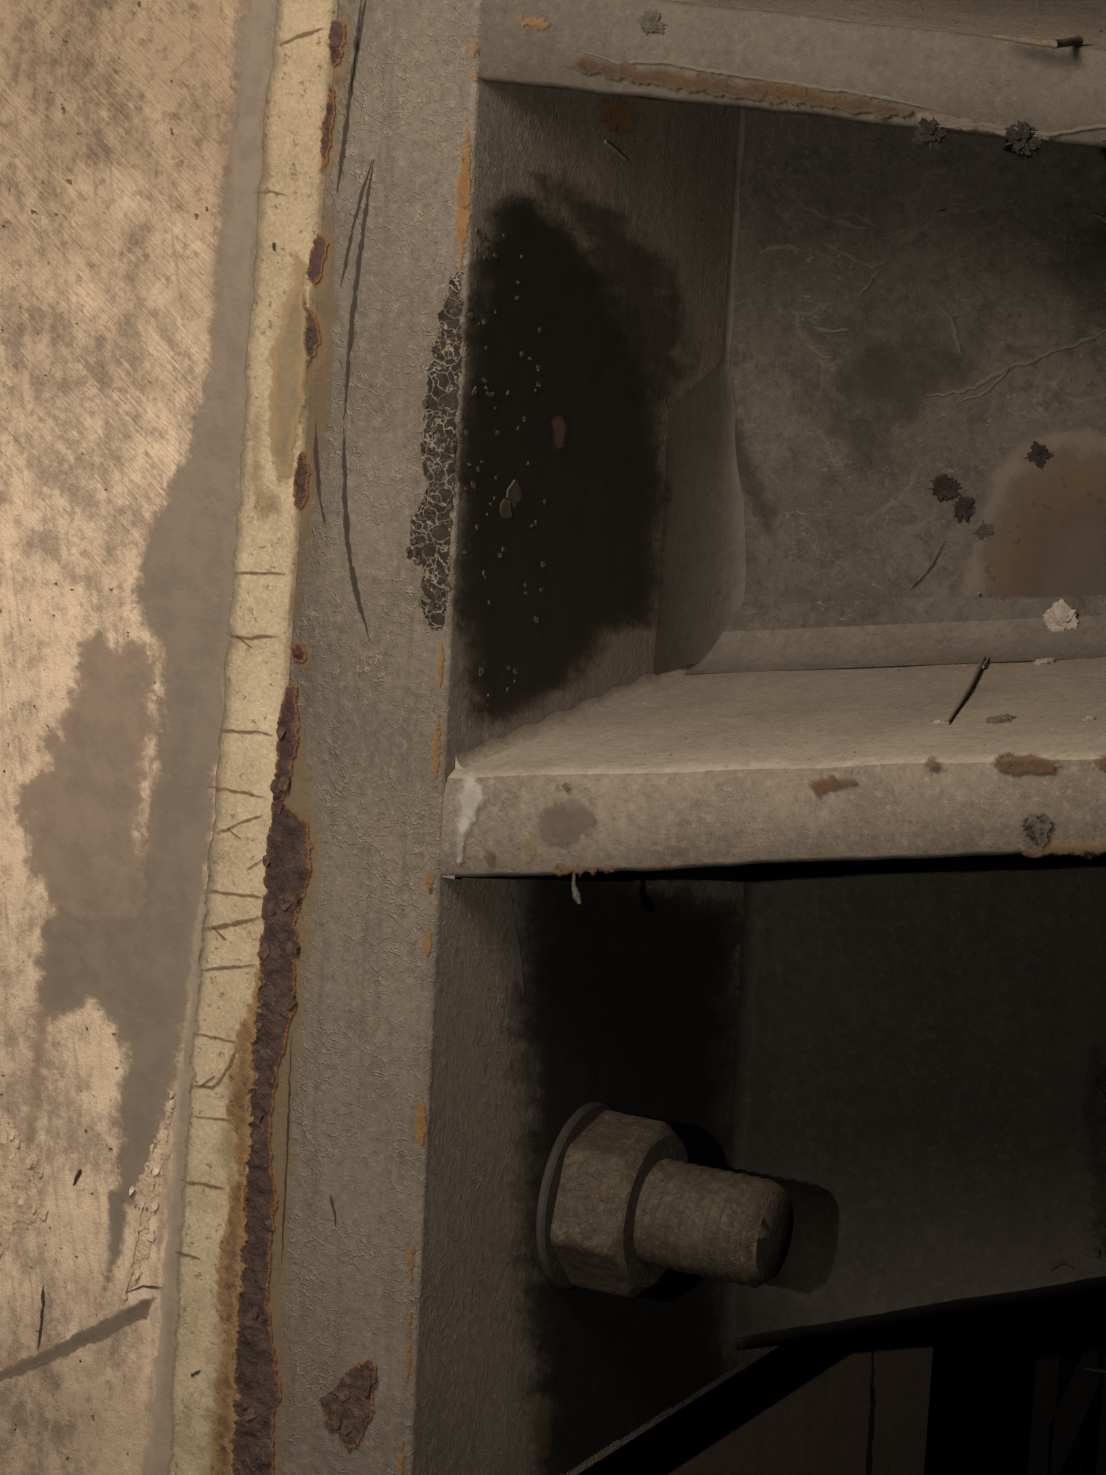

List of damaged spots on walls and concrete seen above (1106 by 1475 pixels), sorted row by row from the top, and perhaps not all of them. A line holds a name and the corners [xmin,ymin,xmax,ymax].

corrosion [319,12,346,172]
corrosion [562,55,1007,135]
leakage [535,175,694,400]
corrosion [292,211,336,615]
leakage [15,0,276,1280]
corrosion [210,684,313,1475]
crack [37,1284,45,1350]
corrosion [318,1358,378,1451]